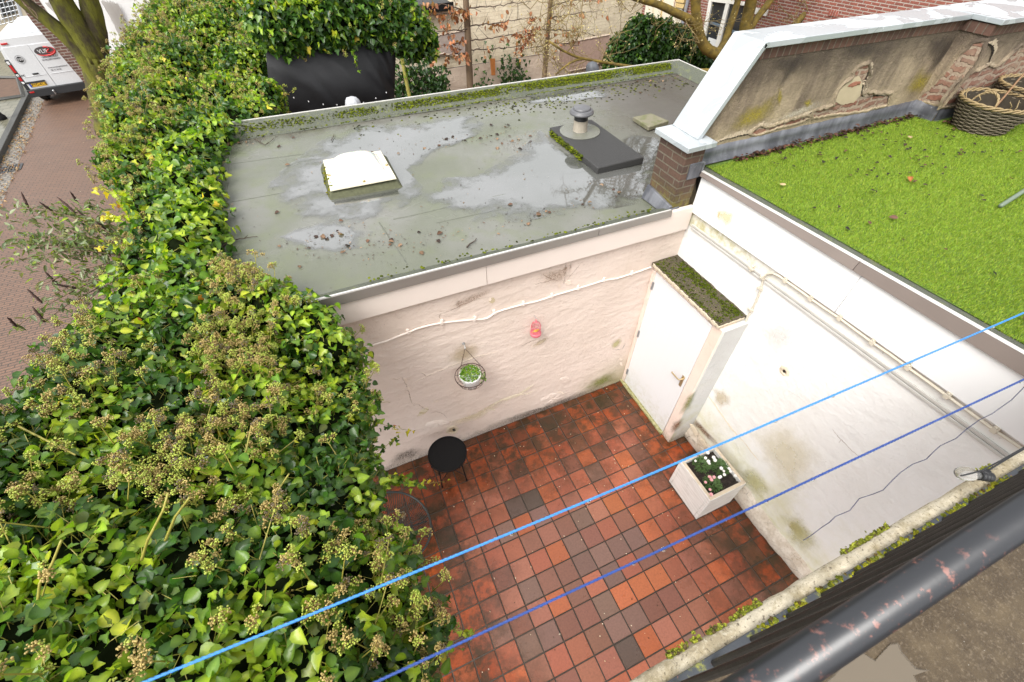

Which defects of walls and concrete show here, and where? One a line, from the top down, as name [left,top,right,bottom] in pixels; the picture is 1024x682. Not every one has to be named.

flaking render [748,60,894,137]
flaking render [916,38,1024,110]